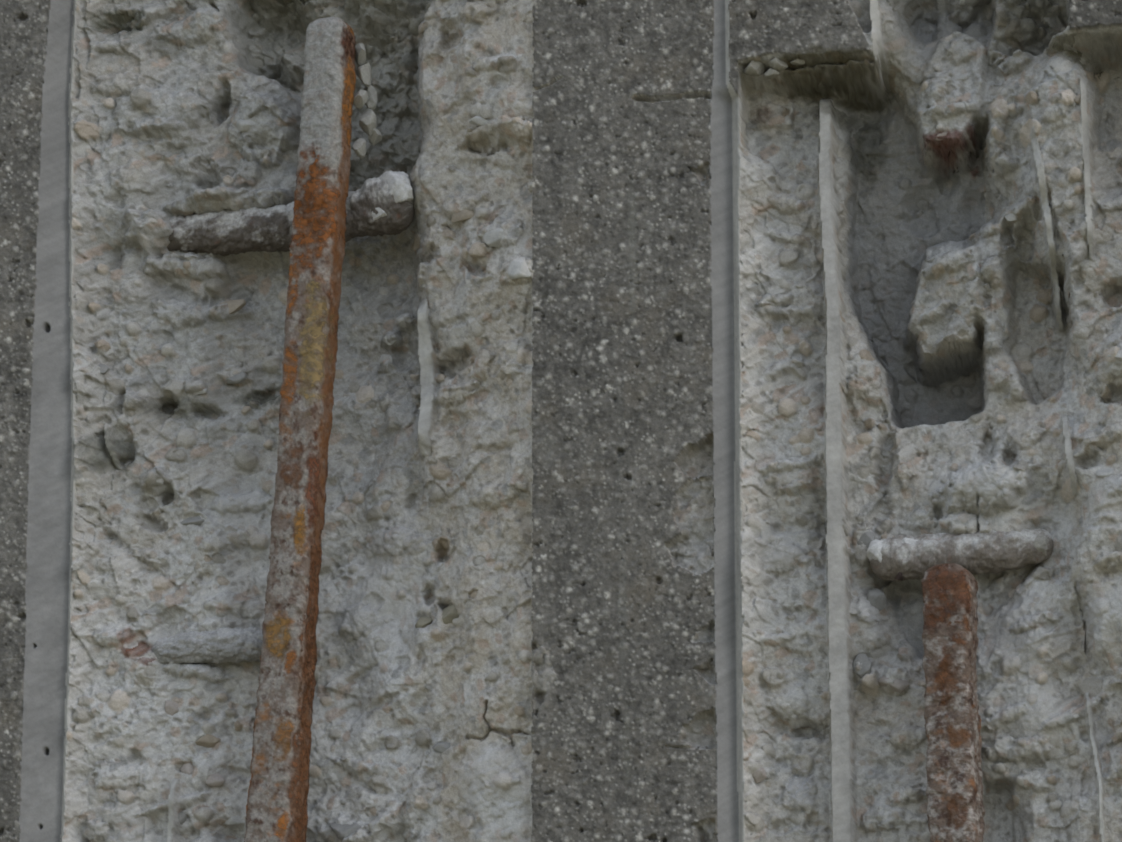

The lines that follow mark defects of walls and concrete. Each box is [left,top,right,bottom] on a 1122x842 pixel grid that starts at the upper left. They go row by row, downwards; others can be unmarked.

rust [341,28,356,152]
rust [280,148,346,427]
spalling [62,0,557,842]
spalling [738,0,1122,842]
spalling [665,433,716,576]
rust [260,431,328,842]
spalling [681,709,717,749]
spalling [694,661,717,685]
rust [921,563,978,705]